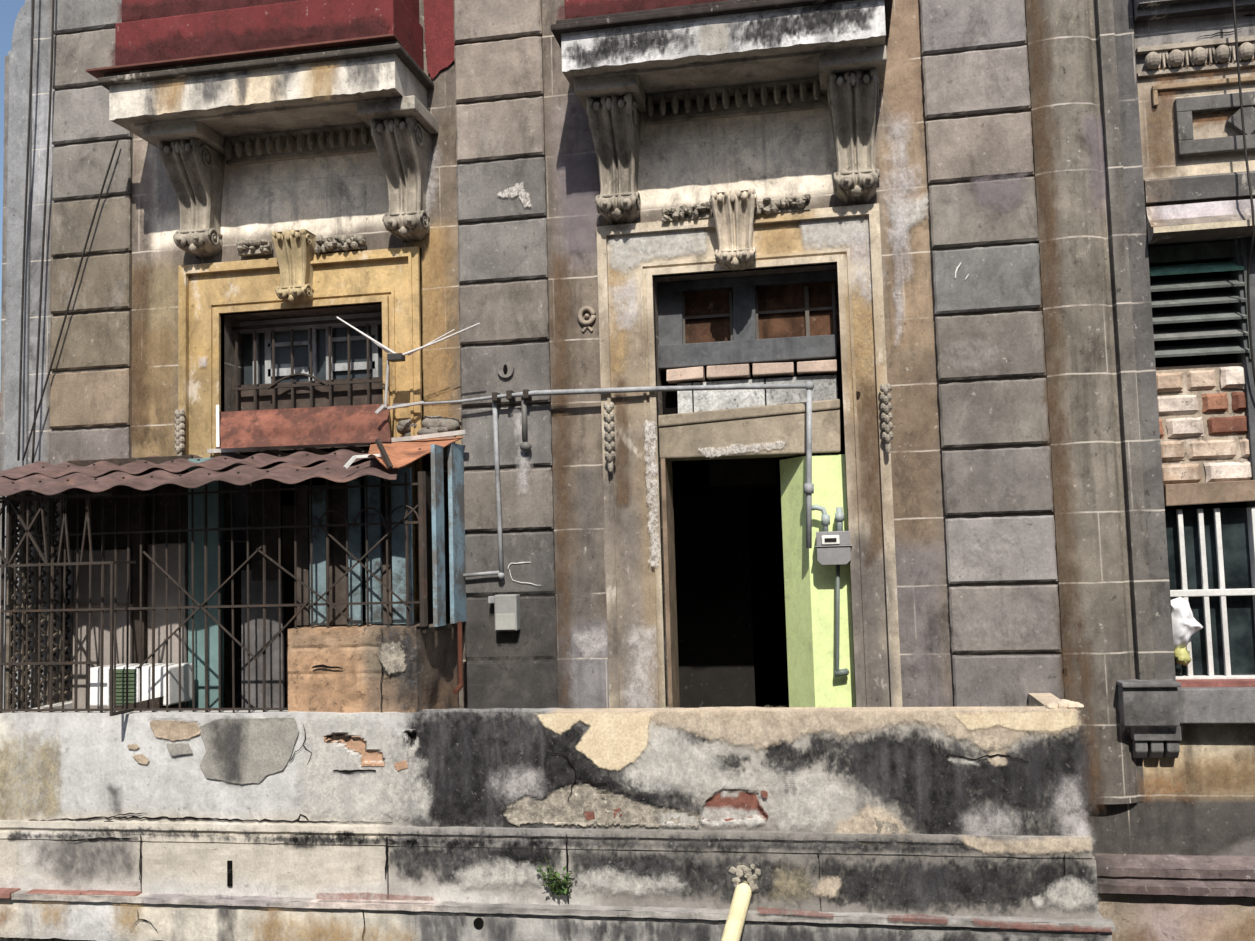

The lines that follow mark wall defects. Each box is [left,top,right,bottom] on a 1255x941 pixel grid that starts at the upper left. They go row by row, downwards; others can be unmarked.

mould [565,26,694,67]
mould [730,3,878,50]
leakage [1032,0,1068,534]
leakage [551,257,607,704]
leakage [615,380,629,504]
leakage [627,630,654,708]
leakage [0,735,229,876]
spalling [127,744,149,765]
peeling [150,715,432,822]
leakage [244,706,1099,941]
peeling [503,707,1081,844]
leakage [218,897,232,941]